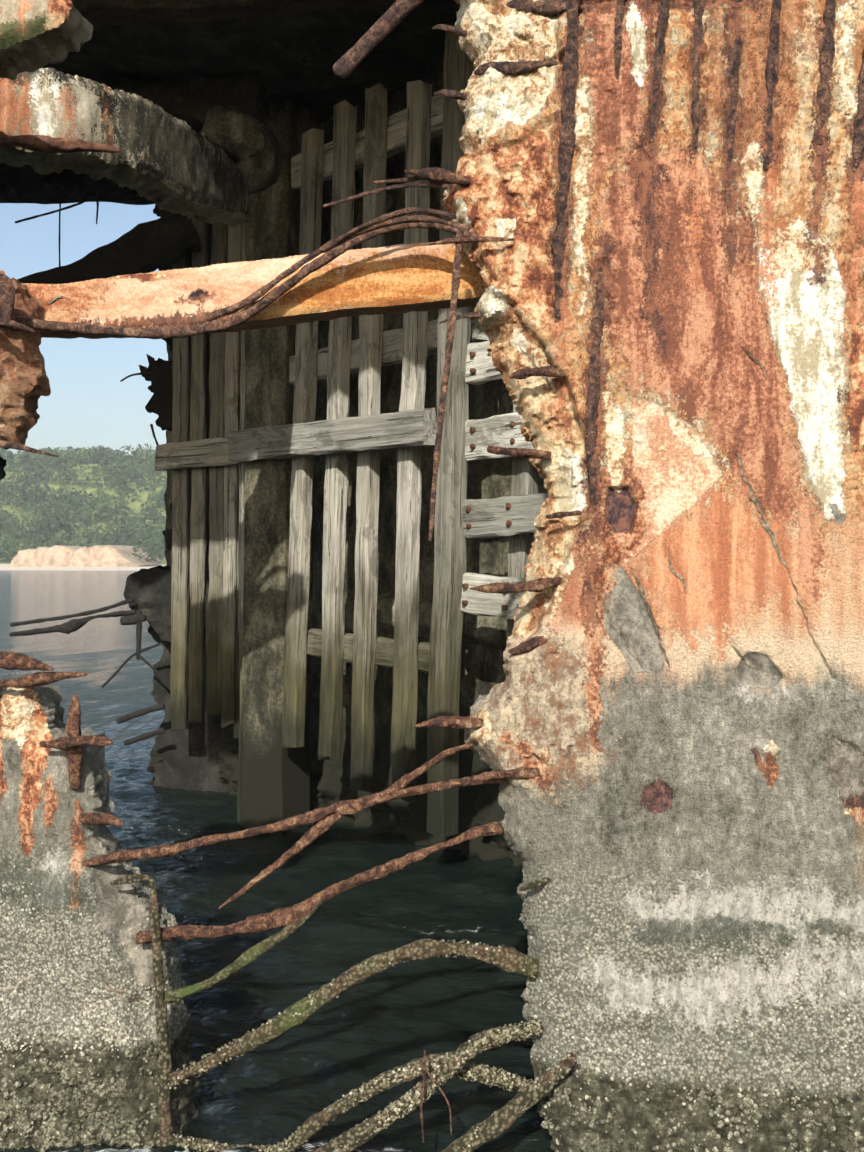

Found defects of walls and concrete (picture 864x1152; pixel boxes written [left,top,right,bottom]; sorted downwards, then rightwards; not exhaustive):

rust [0,0,72,40]
rust [0,72,32,150]
rust [51,73,78,138]
rust [23,244,484,328]
spalling [441,0,722,674]
rust [544,0,864,755]
crack [731,449,834,676]
spalling [0,687,41,751]
rust [0,687,60,856]
rust [67,799,88,915]
spalling [89,837,172,991]